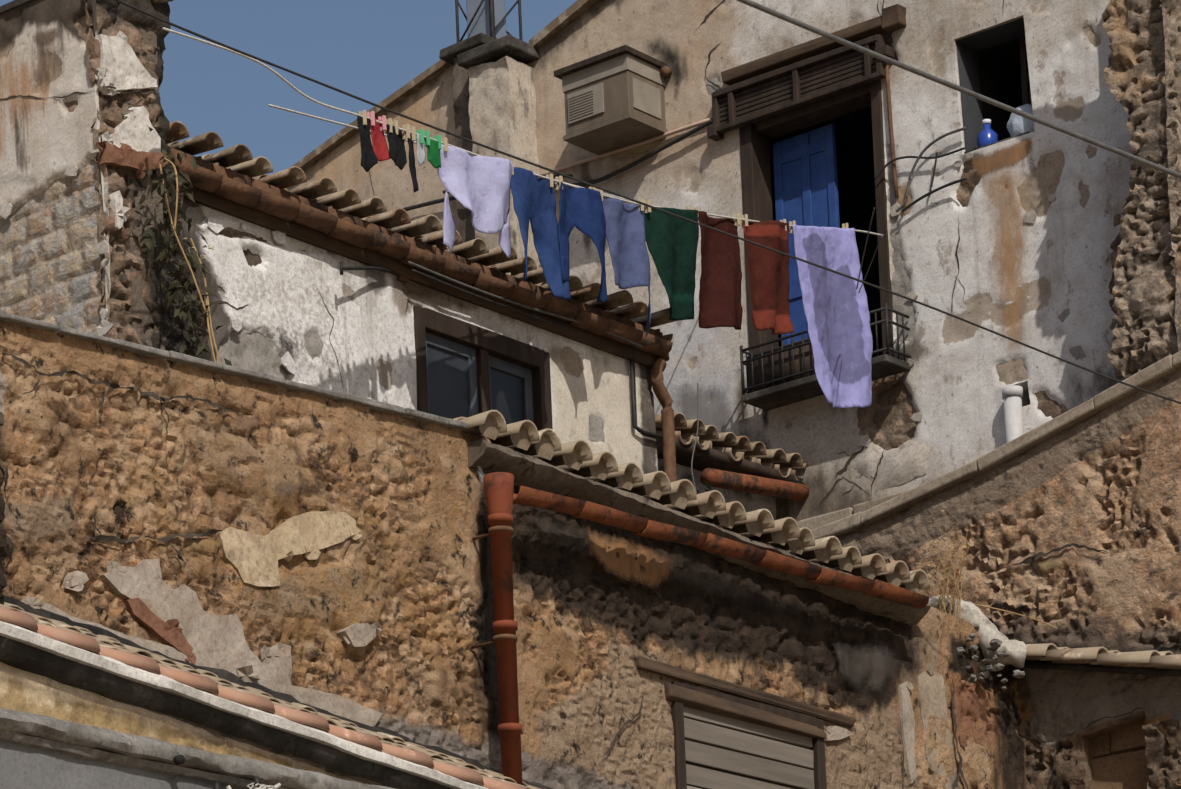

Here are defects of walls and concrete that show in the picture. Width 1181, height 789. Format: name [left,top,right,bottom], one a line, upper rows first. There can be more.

damp [34,29,57,43]
crack [699,0,725,90]
crack [0,86,160,103]
flaking render [954,152,982,207]
flaking render [1005,150,1065,224]
flaking render [887,143,918,342]
crack [951,219,965,317]
corrosion [973,139,1031,343]
crack [2,353,238,434]
flaking render [857,357,923,450]
crack [816,437,885,513]
damp [834,644,894,689]